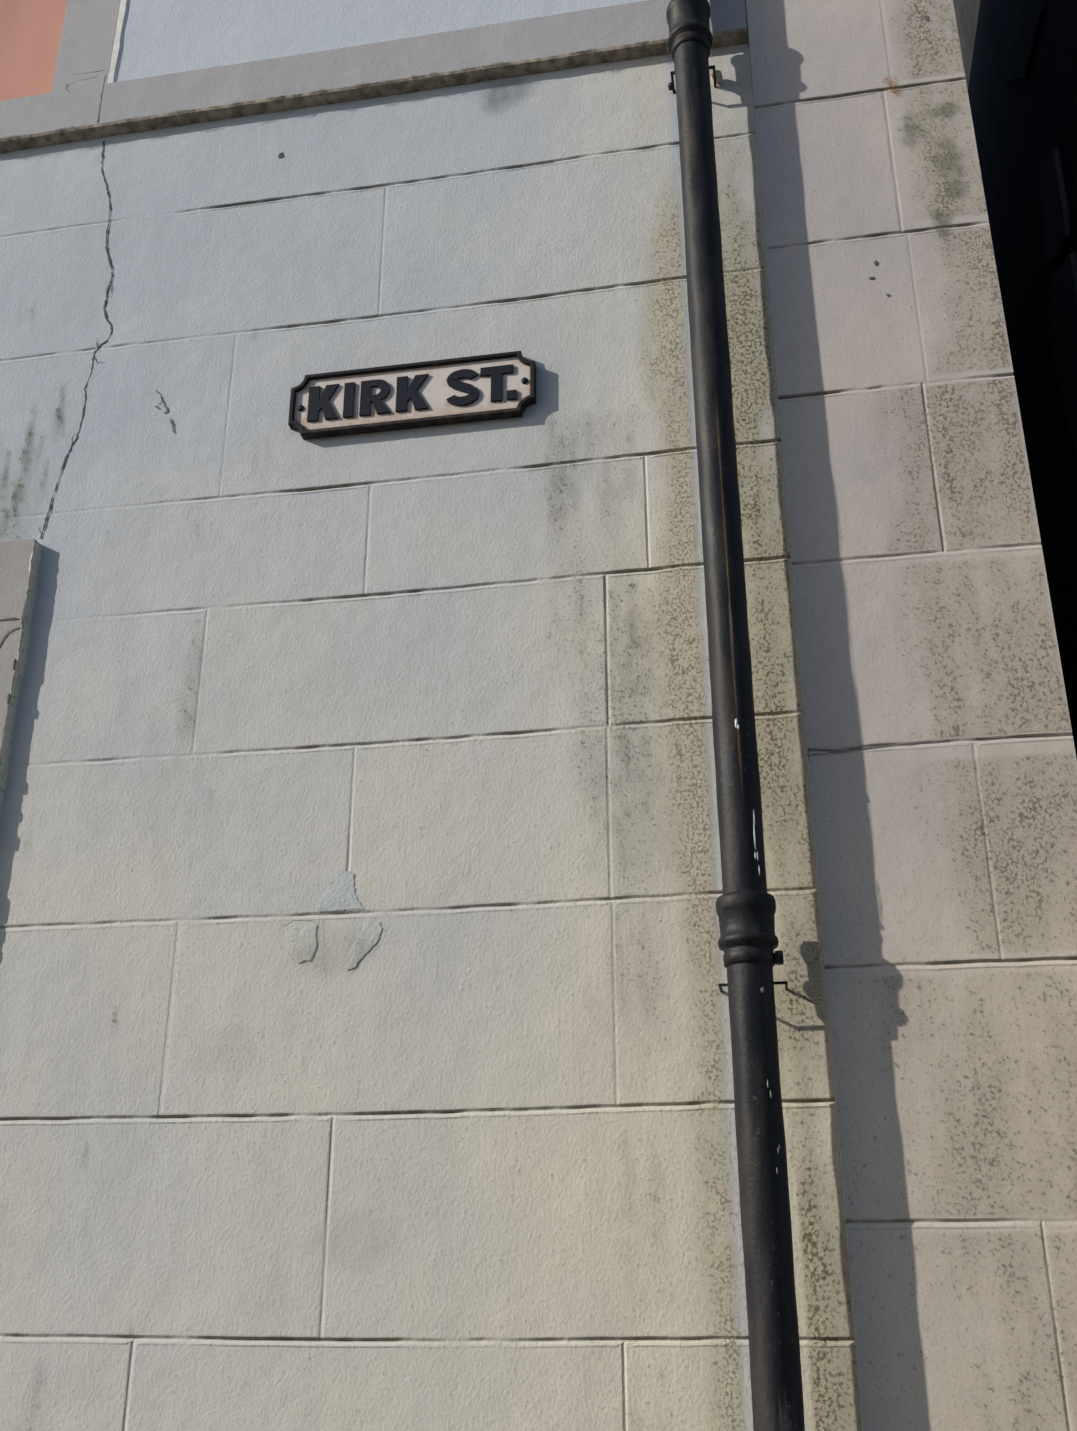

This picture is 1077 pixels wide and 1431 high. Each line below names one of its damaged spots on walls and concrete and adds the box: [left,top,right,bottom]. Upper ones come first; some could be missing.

crack [38,70,113,539]
damp [879,0,1071,738]
crack [0,617,20,645]
damp [574,546,655,847]
damp [937,755,1077,952]
damp [875,973,1077,1215]
damp [942,1231,1076,1431]